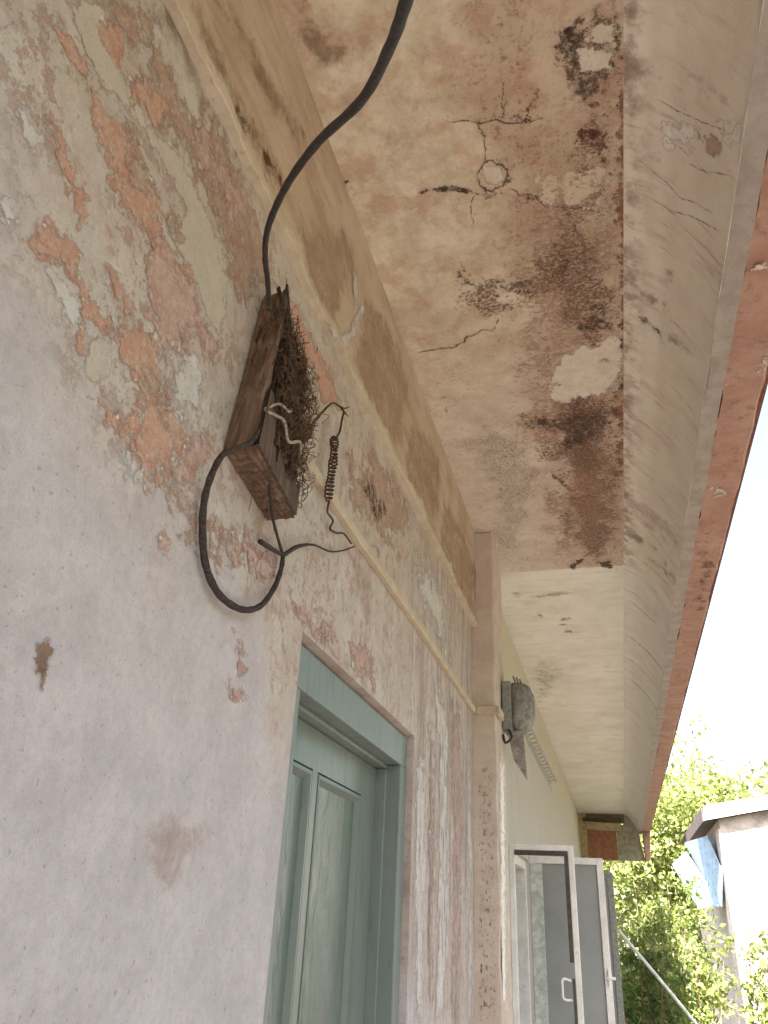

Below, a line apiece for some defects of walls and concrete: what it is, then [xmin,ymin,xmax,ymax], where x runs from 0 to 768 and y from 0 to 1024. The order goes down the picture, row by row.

spalling [575,22,616,73]
crack [421,82,586,223]
leakage [453,6,623,348]
spalling [529,157,610,213]
peeling [697,131,722,157]
peeling [27,0,278,591]
peeling [290,300,343,411]
crack [419,319,499,353]
spalling [547,335,623,403]
leakage [515,390,624,559]
rust [34,638,54,690]
peeling [225,627,249,703]